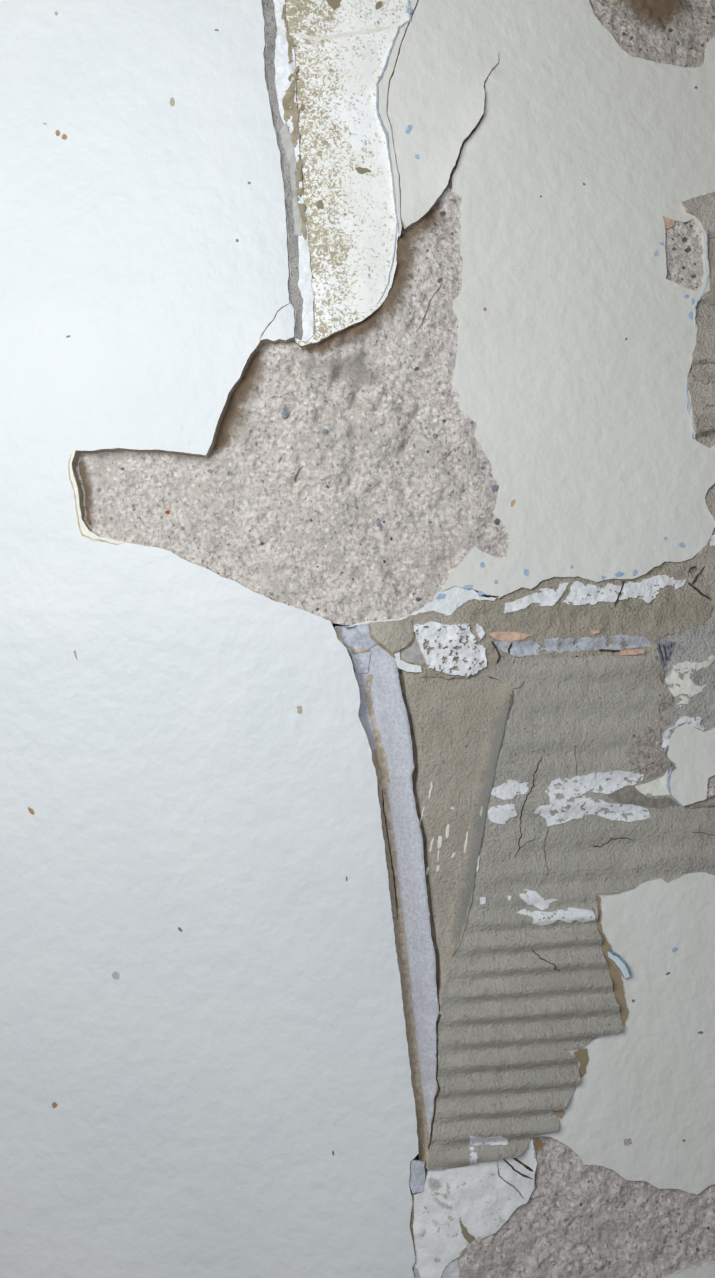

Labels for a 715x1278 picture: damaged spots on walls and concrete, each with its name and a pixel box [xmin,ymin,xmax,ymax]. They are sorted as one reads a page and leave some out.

spalling [589,0,715,68]
crack [446,54,499,188]
spalling [68,0,515,626]
spalling [654,217,704,319]
spalling [707,776,715,799]
peeling [607,950,631,979]
spalling [441,1136,715,1278]